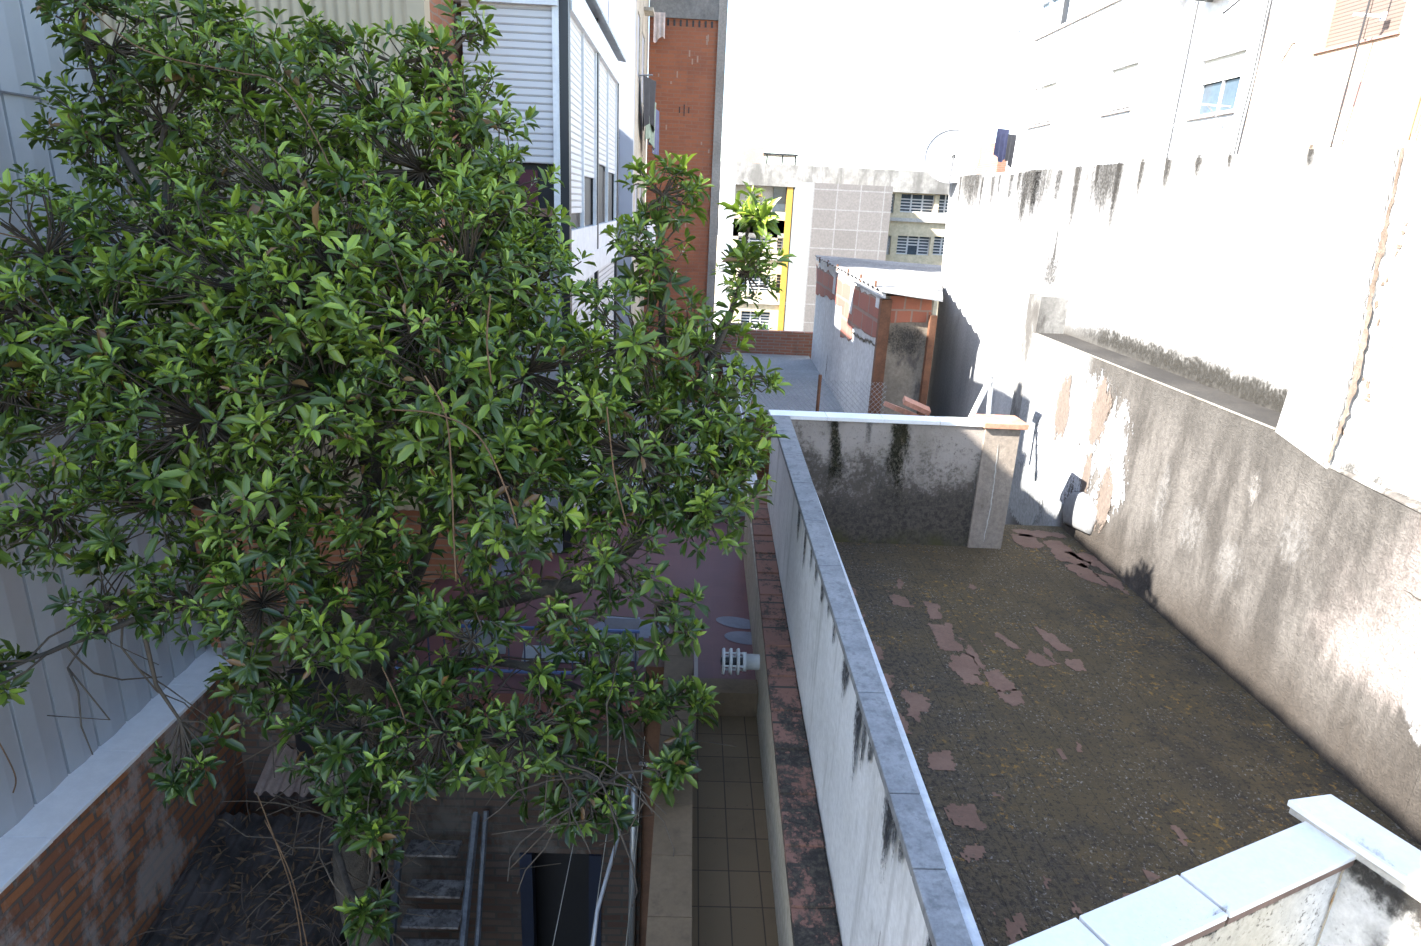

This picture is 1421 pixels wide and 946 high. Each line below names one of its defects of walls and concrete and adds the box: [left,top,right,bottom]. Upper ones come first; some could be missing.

water stain [957,159,1145,294]
water stain [828,421,841,485]
water stain [887,424,910,496]
peeling [1029,348,1130,533]
peeling [1010,533,1129,594]
peeling [923,601,942,620]
peeling [872,641,931,734]
peeling [948,632,1087,706]
water stain [779,577,841,946]
water stain [882,793,903,863]
peeling [943,803,987,863]
peeling [1004,913,1028,945]